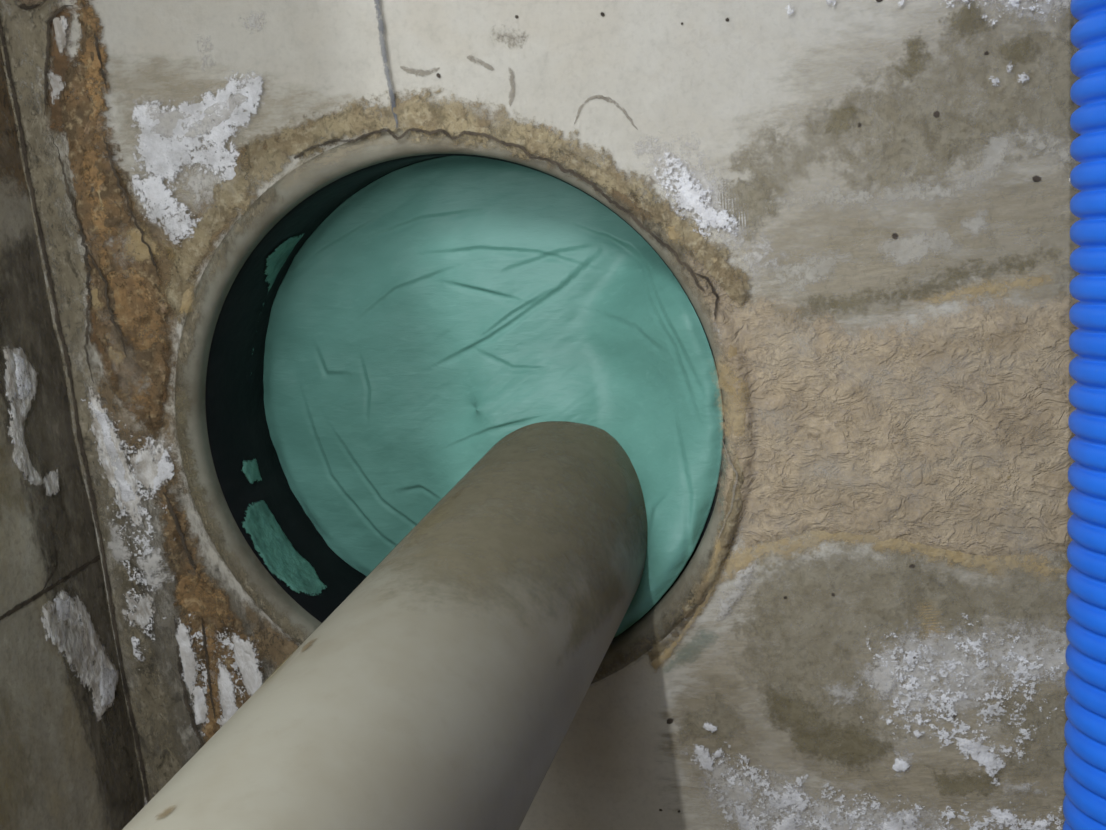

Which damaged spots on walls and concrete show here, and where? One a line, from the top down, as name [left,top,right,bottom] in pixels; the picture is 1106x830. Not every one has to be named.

damp [401,66,439,76]
crack [294,0,719,320]
damp [796,0,1081,208]
rust [46,0,299,744]
damp [130,69,1080,830]